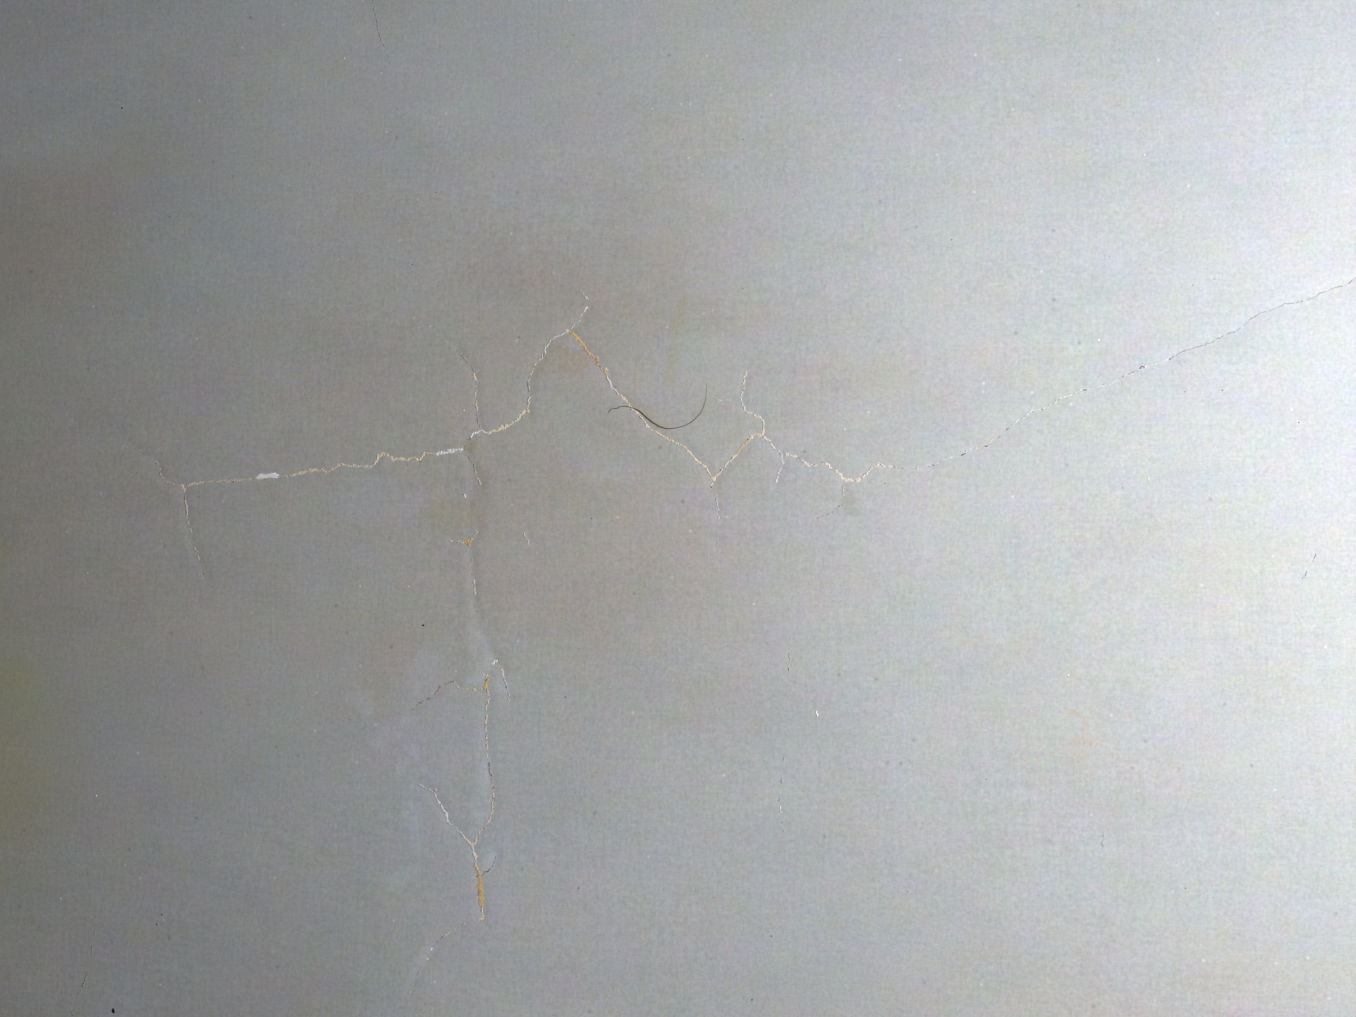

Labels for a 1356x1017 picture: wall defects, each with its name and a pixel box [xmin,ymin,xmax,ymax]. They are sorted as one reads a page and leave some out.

crack [449,531,480,611]
crack [128,278,1356,575]
crack [409,659,510,993]